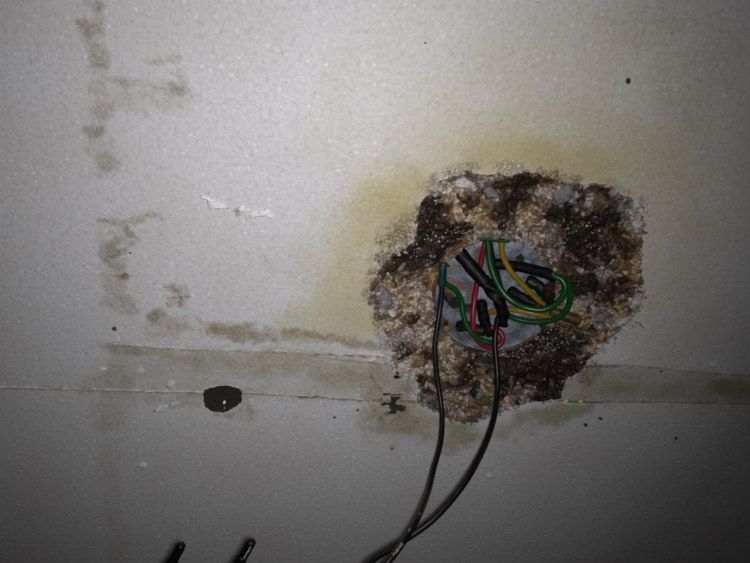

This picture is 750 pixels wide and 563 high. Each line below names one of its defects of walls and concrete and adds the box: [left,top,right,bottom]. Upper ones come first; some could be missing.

spalling [364,160,649,426]